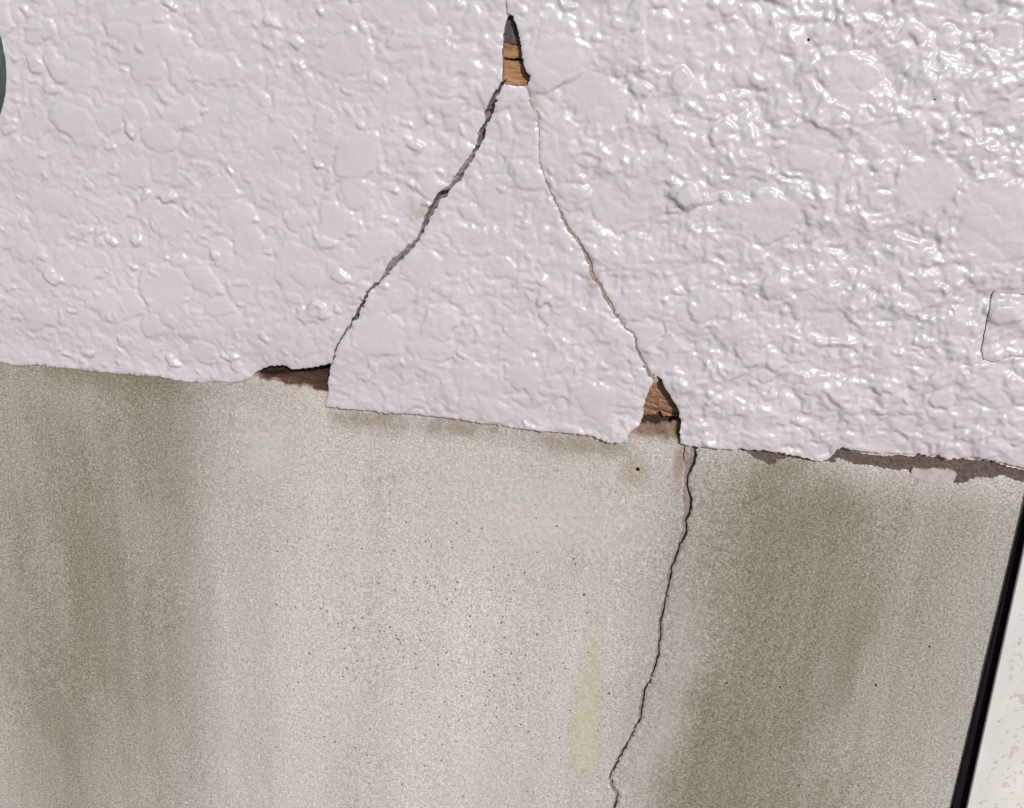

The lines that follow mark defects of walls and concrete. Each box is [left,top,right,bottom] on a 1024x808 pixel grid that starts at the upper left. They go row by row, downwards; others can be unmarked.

spalling [502,15,531,87]
crack [331,79,658,383]
spalling [248,363,331,395]
spalling [628,376,681,445]
peeling [738,448,1024,485]
crack [608,445,698,808]